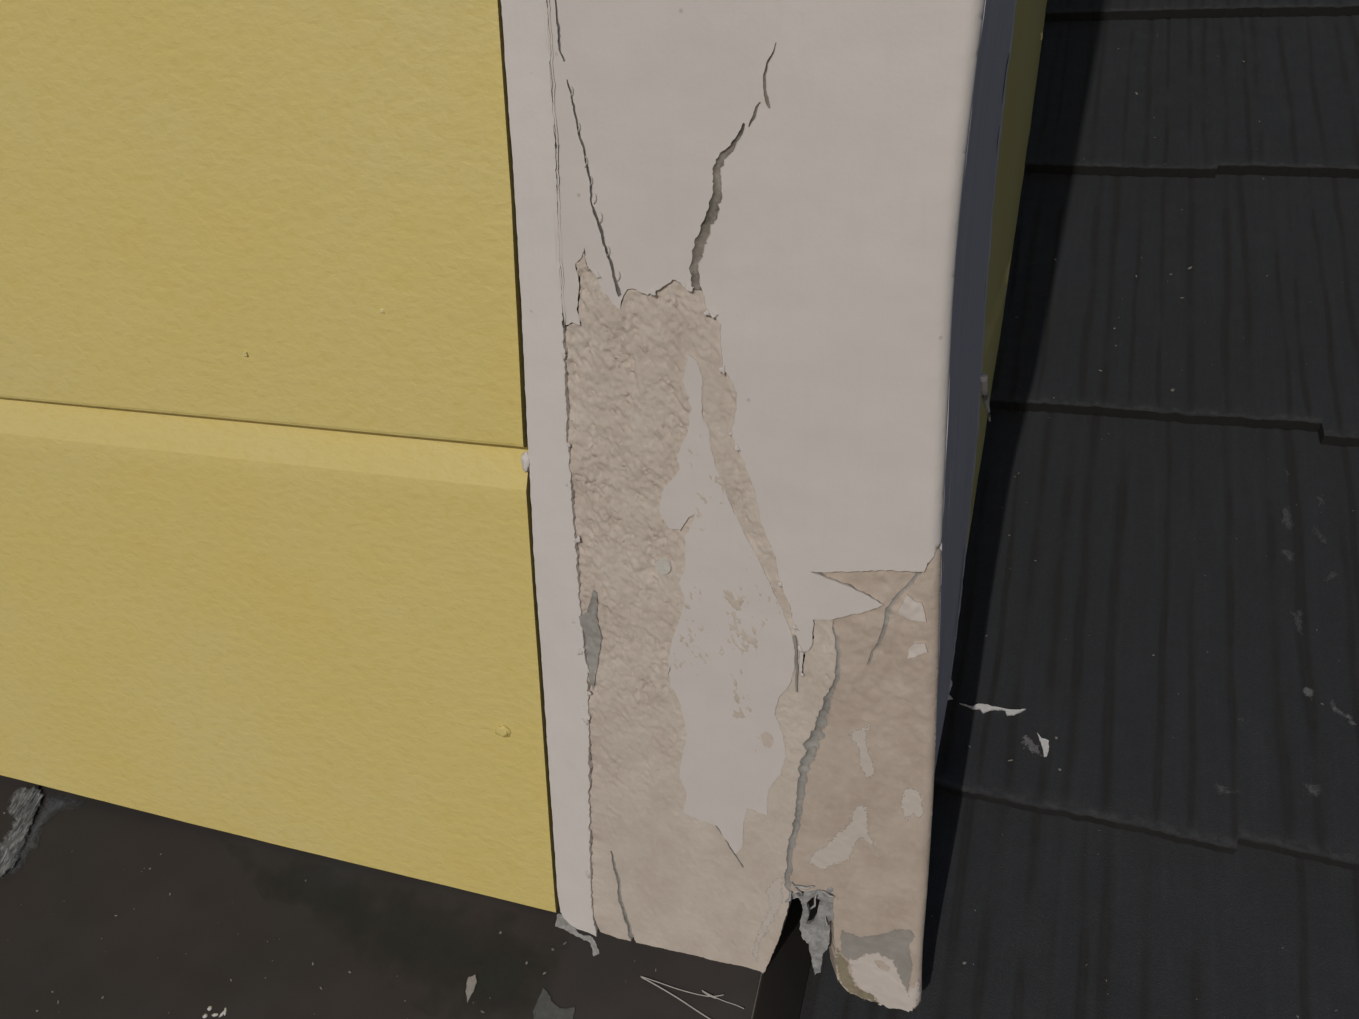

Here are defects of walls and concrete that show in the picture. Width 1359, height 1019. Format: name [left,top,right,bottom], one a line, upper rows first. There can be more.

crack [547,0,622,327]
crack [689,43,776,290]
spalling [561,248,1026,1012]